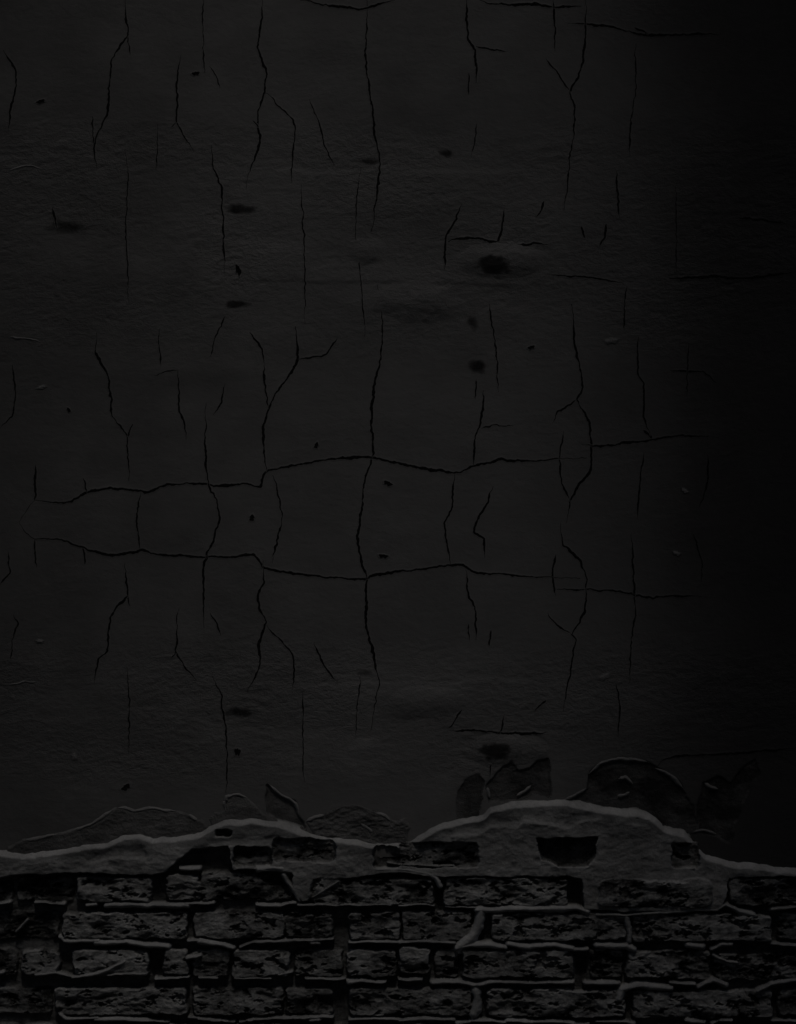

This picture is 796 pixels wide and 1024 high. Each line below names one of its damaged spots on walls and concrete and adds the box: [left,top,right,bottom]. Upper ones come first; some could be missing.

crack [0,0,718,793]
peeling [7,783,411,854]
peeling [456,758,553,819]
peeling [565,757,699,842]